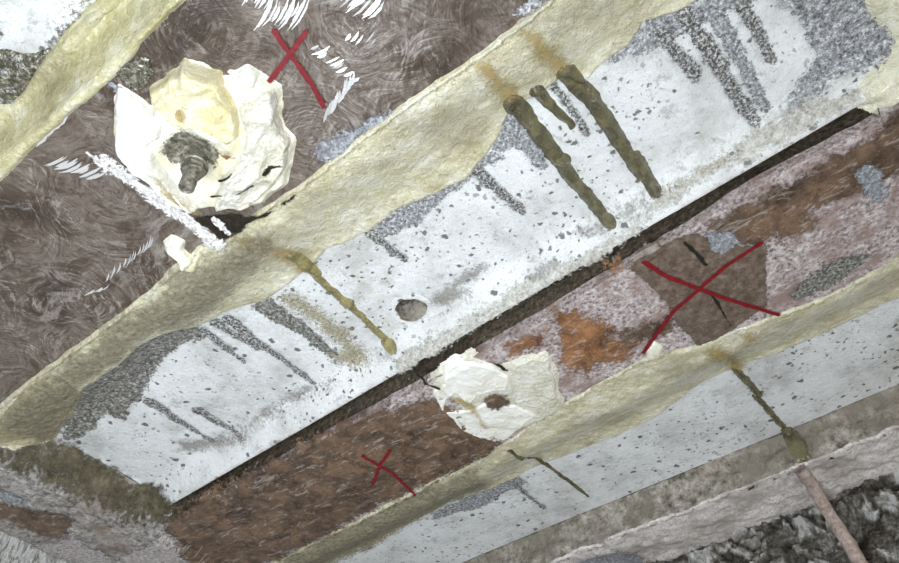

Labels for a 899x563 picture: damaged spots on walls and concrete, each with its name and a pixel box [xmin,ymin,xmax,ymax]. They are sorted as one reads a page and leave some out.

corrosion [503,303,675,379]
corrosion [484,394,510,411]